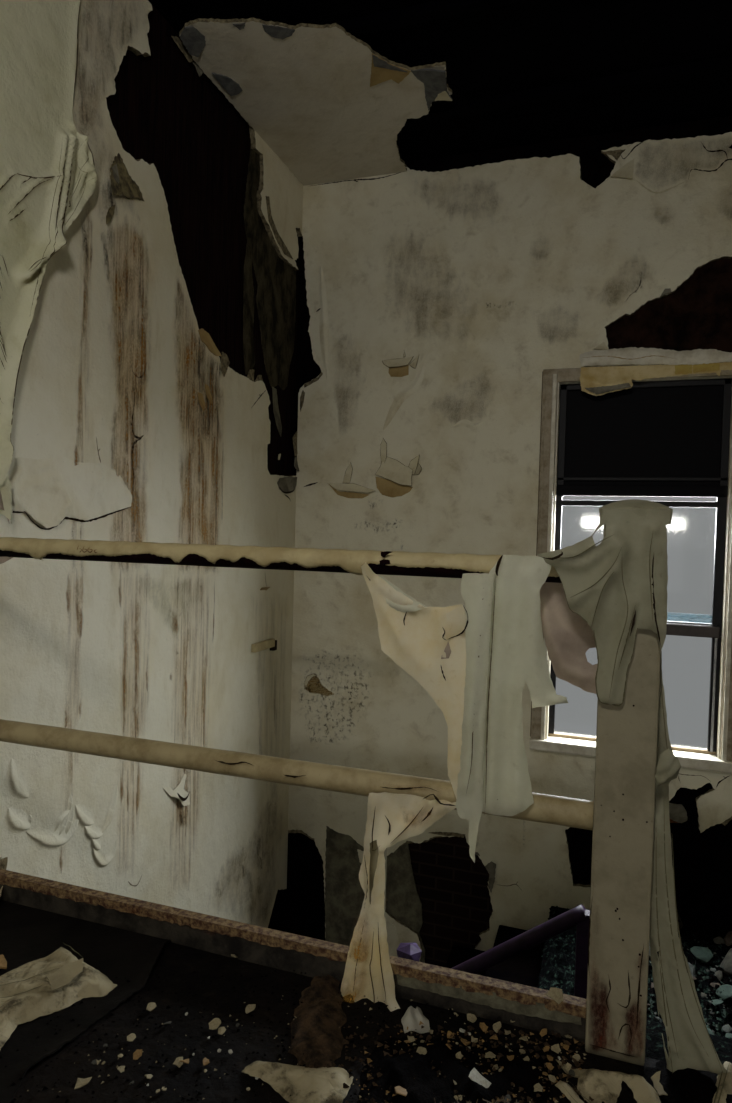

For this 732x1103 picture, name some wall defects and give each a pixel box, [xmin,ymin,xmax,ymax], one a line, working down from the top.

peeling [370,53,452,111]
flaking render [405,116,732,194]
peeling [0,0,98,524]
water stain [82,224,148,542]
water stain [177,330,221,545]
flaking render [106,0,323,476]
peeling [328,438,422,499]
flaking render [580,258,732,396]
peeling [268,509,732,1103]
rust [0,869,350,962]
rust [389,955,608,1050]